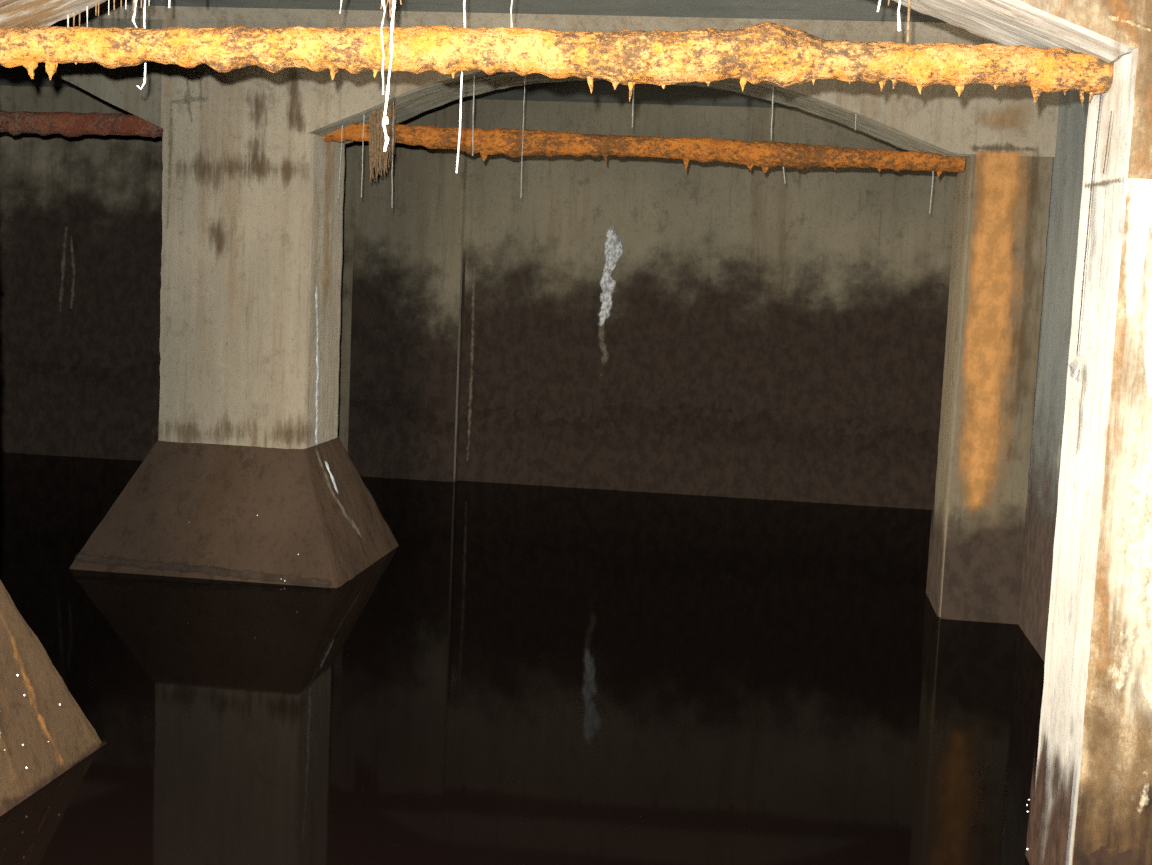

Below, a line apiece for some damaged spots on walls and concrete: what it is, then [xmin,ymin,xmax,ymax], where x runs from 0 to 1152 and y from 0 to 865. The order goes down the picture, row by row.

rust [23,61,58,80]
water stain [290,72,301,127]
rust [610,80,635,102]
rust [1030,85,1042,105]
water stain [1140,0,1152,102]
rust [962,145,1037,510]
water stain [348,226,1058,662]
water stain [1085,178,1152,731]
water stain [1025,724,1152,865]